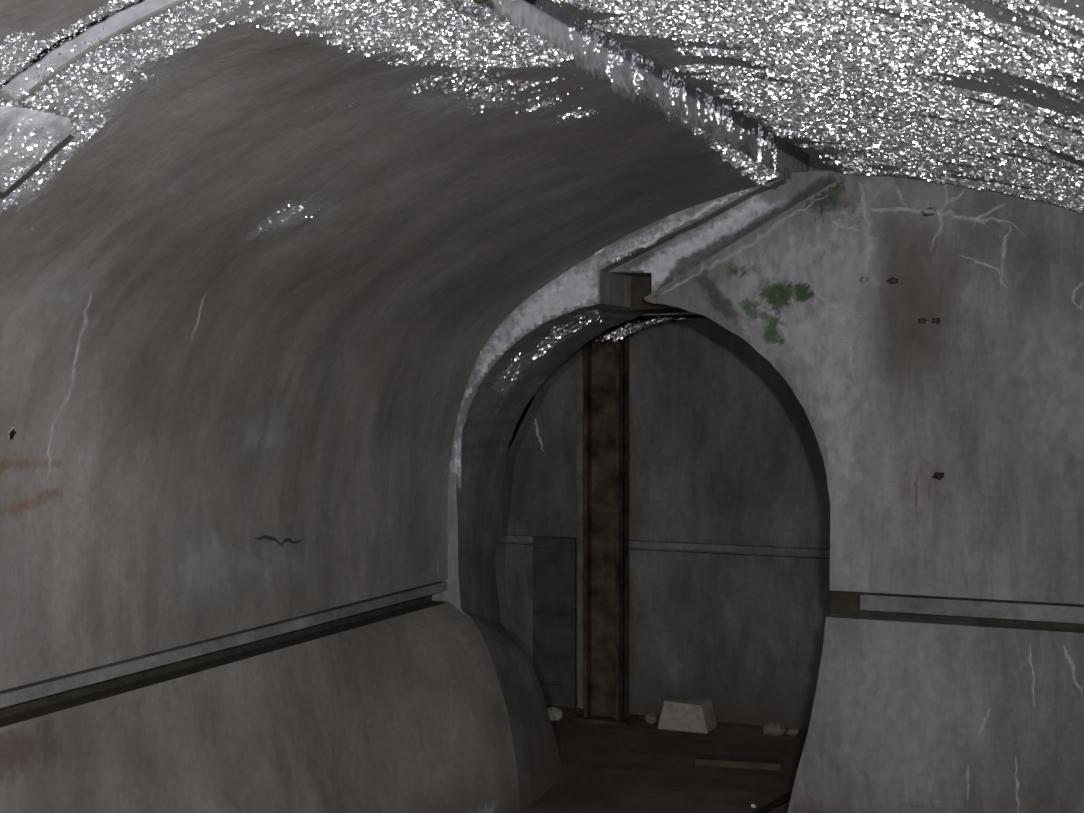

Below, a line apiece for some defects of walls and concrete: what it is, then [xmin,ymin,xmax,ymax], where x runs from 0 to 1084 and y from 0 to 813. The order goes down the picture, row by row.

crack [833,182,1023,284]
leakage [467,267,598,397]
leakage [594,178,874,502]